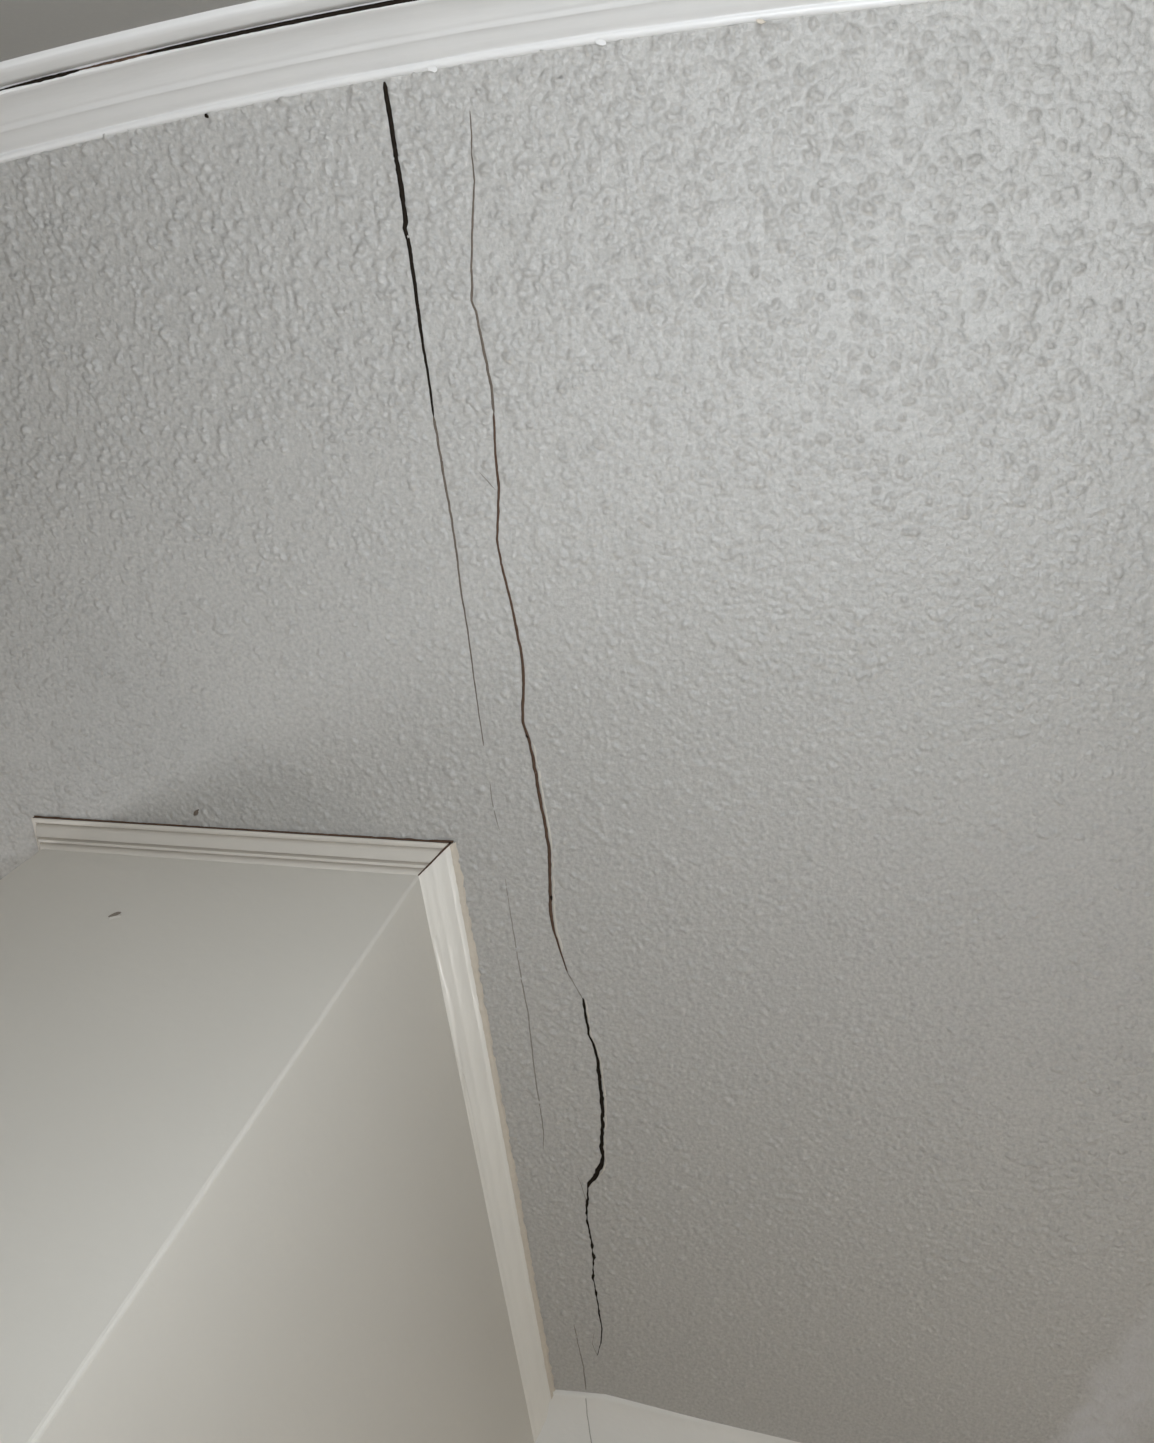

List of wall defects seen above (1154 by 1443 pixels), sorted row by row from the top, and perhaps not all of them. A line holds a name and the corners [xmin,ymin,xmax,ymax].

crack [383,82,484,746]
crack [470,114,607,1443]